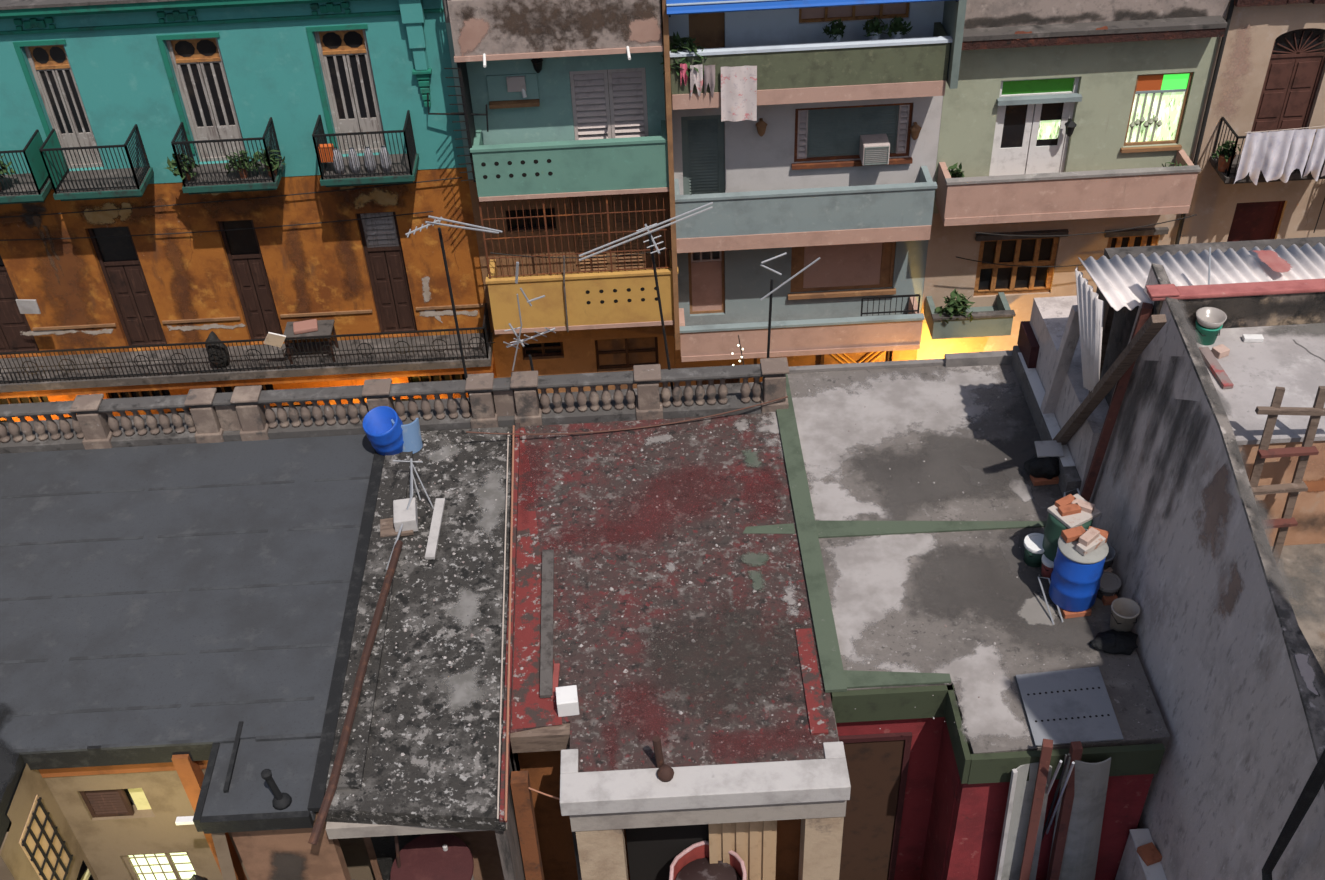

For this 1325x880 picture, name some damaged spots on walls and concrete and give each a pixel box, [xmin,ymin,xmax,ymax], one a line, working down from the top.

damp [490,0,661,52]
damp [856,398,1063,521]